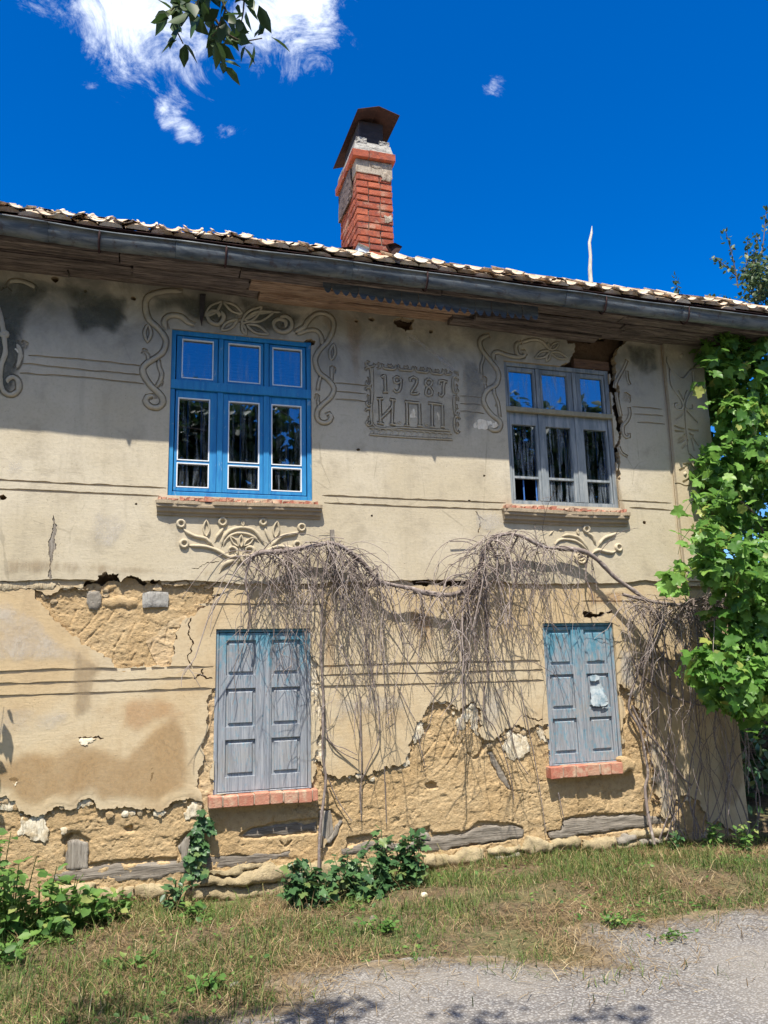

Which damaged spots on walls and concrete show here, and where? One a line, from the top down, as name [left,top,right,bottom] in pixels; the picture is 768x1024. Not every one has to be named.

spalling [28,515,216,672]
crack [187,594,220,679]
spalling [0,657,745,913]